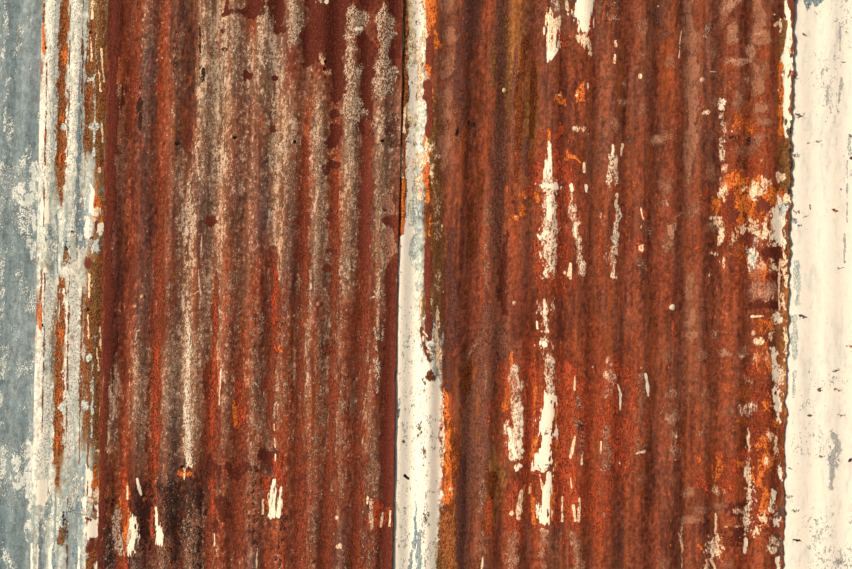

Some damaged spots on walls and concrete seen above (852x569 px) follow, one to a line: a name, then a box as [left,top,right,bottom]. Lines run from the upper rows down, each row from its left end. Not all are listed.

corrosion [38,0,397,569]
corrosion [421,0,484,260]
corrosion [420,176,636,569]
corrosion [509,35,581,298]
peeling [461,122,682,569]
corrosion [554,81,590,112]
peeling [525,0,620,74]
peeling [696,397,769,569]
corrosion [693,107,811,569]
peeling [719,260,812,417]
peeling [767,545,781,569]
peeling [788,425,852,490]